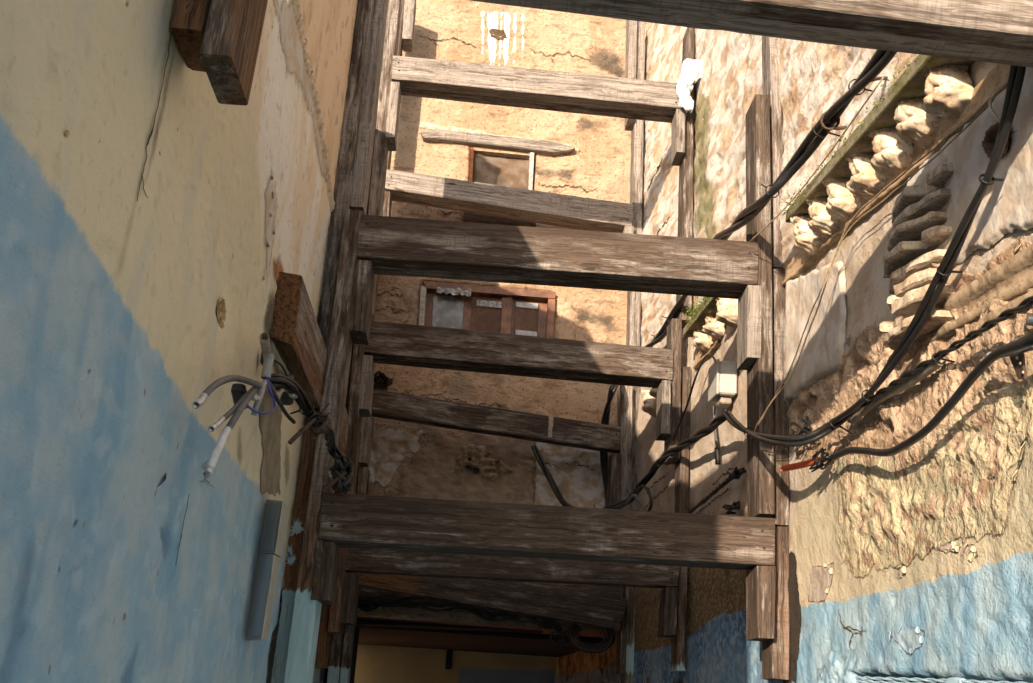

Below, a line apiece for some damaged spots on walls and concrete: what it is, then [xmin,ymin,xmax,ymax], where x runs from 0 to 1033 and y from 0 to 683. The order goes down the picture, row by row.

crack [137,32,172,202]
spalling [949,236,1030,292]
spalling [787,287,1033,481]
peeling [938,541,978,562]